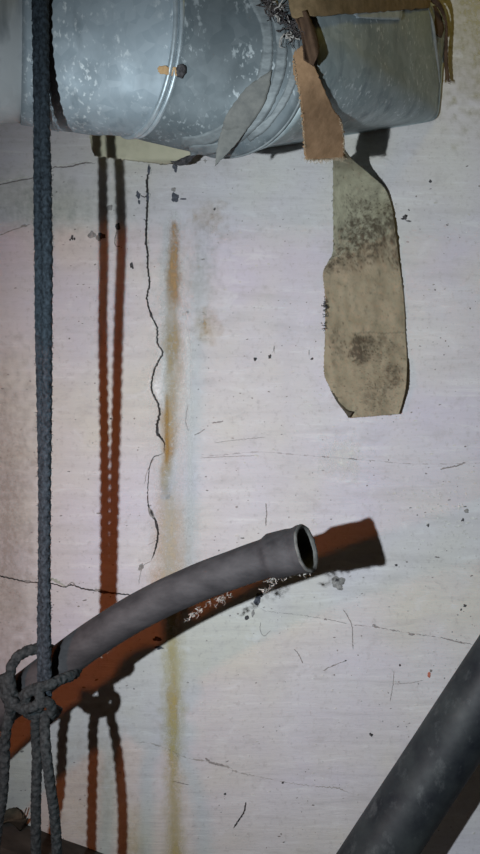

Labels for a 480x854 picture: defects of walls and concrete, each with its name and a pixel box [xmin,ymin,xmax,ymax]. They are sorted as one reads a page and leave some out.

crack [53,160,94,168]
corrosion [168,224,178,308]
crack [0,165,165,595]
corrosion [162,325,179,483]
corrosion [165,612,183,760]